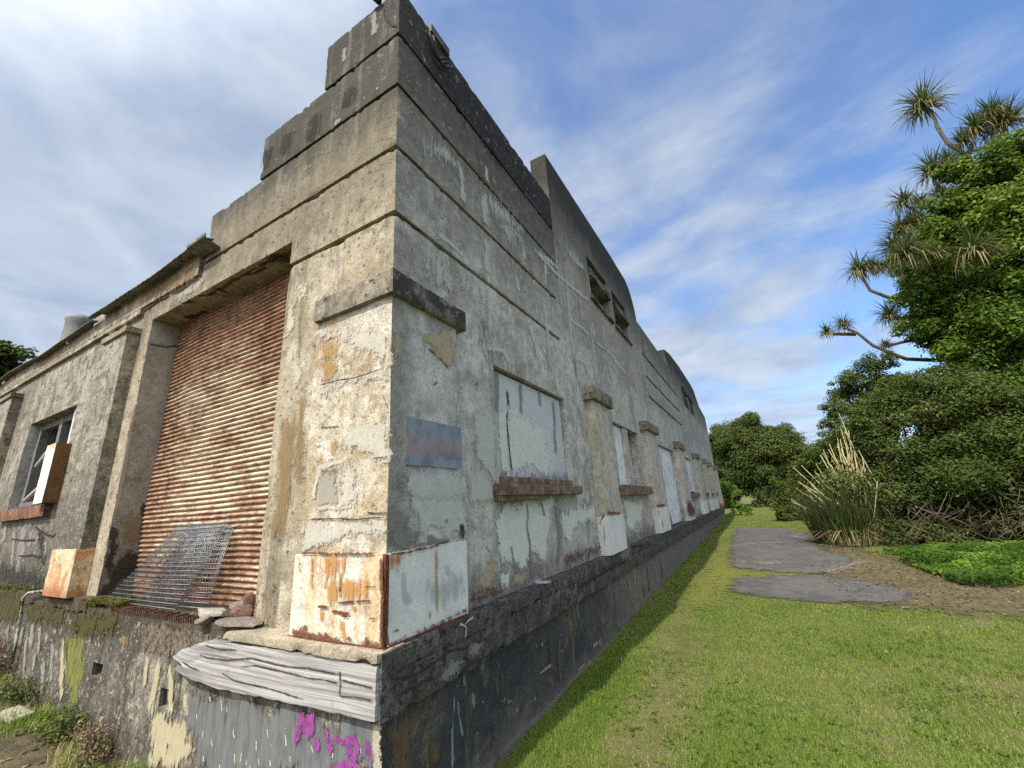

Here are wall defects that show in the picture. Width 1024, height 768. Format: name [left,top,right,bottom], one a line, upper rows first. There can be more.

peeling [283,283,307,338]
peeling [312,323,402,398]
peeling [300,404,595,589]
rust [565,511,620,567]
rust [287,541,506,650]
water stain [439,616,484,681]